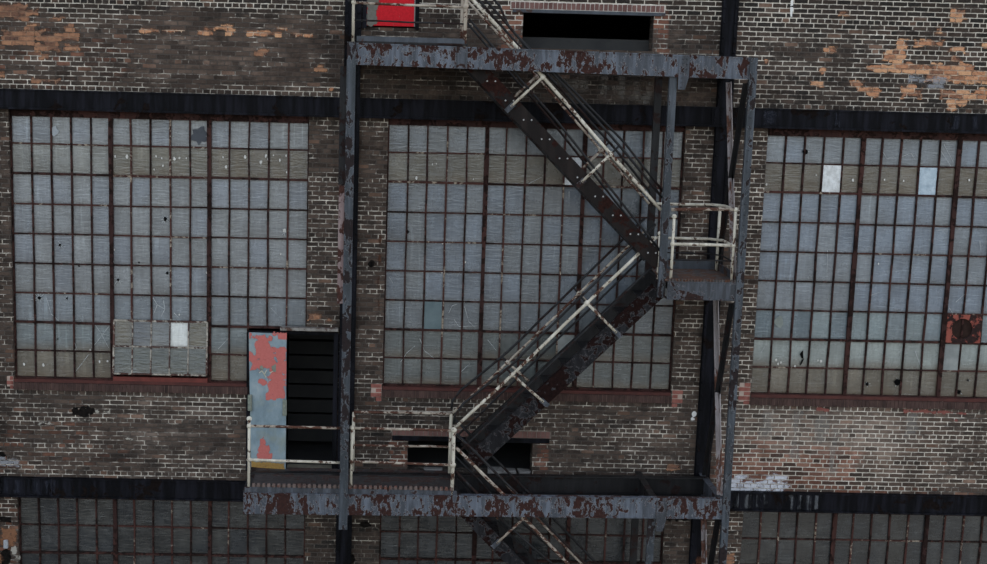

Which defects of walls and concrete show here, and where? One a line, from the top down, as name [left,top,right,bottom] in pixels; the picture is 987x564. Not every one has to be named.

peeling [366,0,379,27]
spalling [0,2,80,60]
spalling [197,24,313,38]
spalling [866,9,987,112]
spalling [810,67,826,87]
spalling [849,80,882,98]
peeling [249,332,287,400]
peeling [257,437,272,462]
water stain [731,475,818,509]